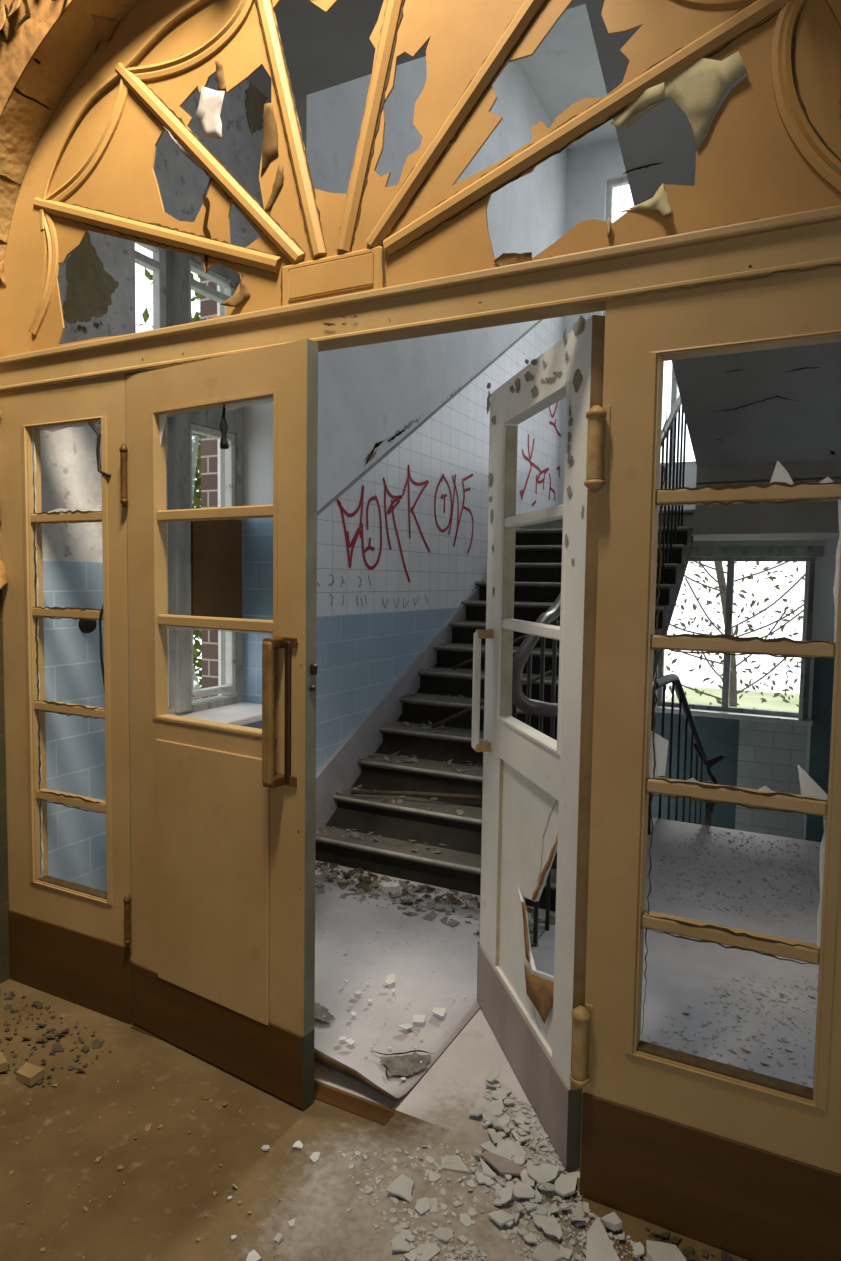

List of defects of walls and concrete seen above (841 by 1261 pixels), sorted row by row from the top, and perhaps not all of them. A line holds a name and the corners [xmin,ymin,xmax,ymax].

peeling [0,0,31,42]
peeling [63,231,119,334]
peeling [486,383,496,425]
peeling [510,315,585,467]
peeling [0,560,8,589]